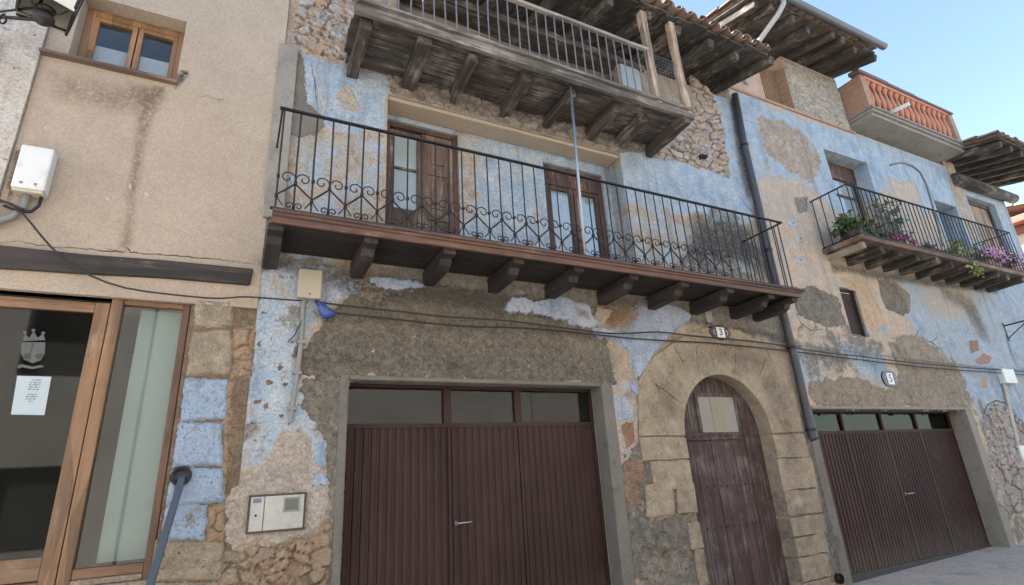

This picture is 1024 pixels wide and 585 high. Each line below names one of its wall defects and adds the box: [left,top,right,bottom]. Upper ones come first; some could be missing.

spalling [757,115,823,183]
crack [10,241,251,264]
spalling [795,285,846,328]
spalling [877,279,911,316]
spalling [808,334,968,411]
spalling [248,261,700,585]